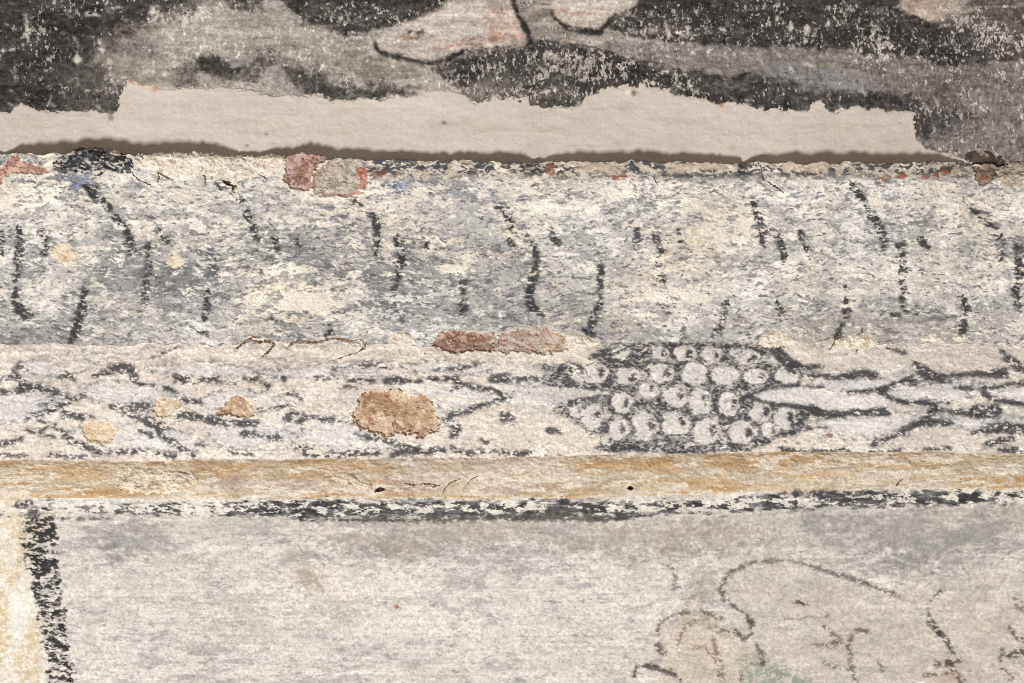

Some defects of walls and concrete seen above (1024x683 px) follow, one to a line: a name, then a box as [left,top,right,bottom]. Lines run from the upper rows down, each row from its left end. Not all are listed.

spalling [964,151,1005,167]
spalling [0,147,328,221]
flaking render [433,326,568,355]
spalling [216,395,256,419]
spalling [351,388,442,439]